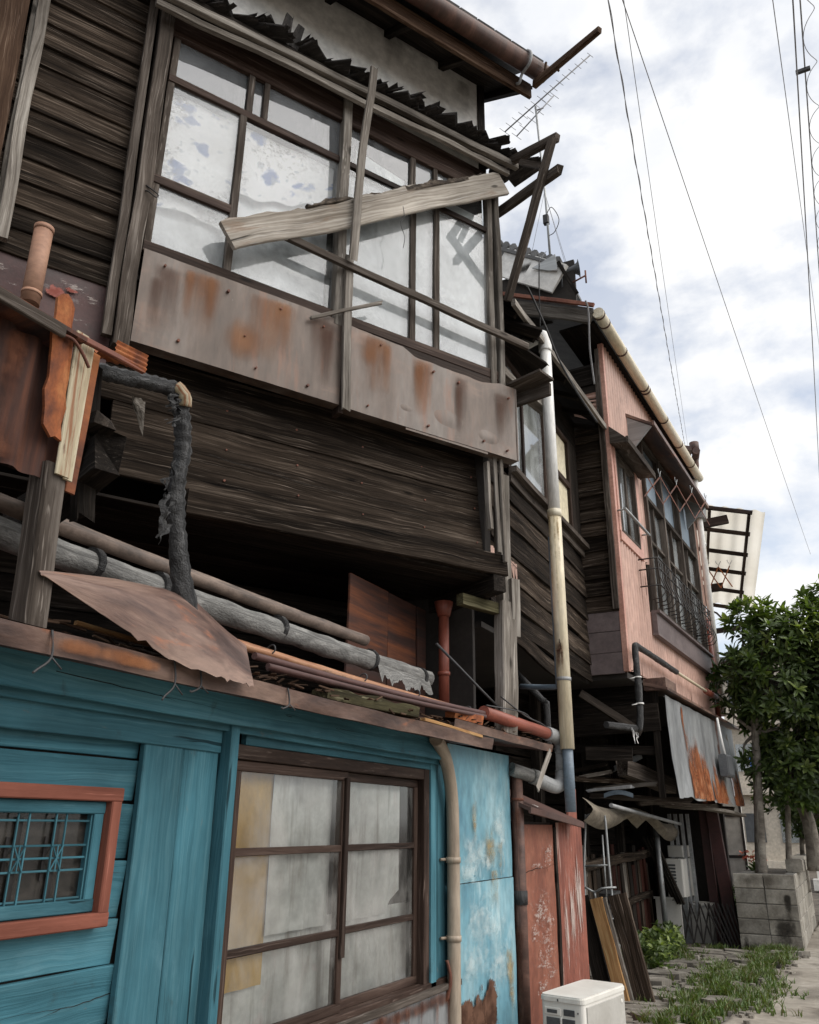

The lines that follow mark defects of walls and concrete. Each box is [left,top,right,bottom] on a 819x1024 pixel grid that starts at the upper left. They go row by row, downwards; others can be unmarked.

corrosion [64,641,157,669]
peeling [461,979,498,1024]